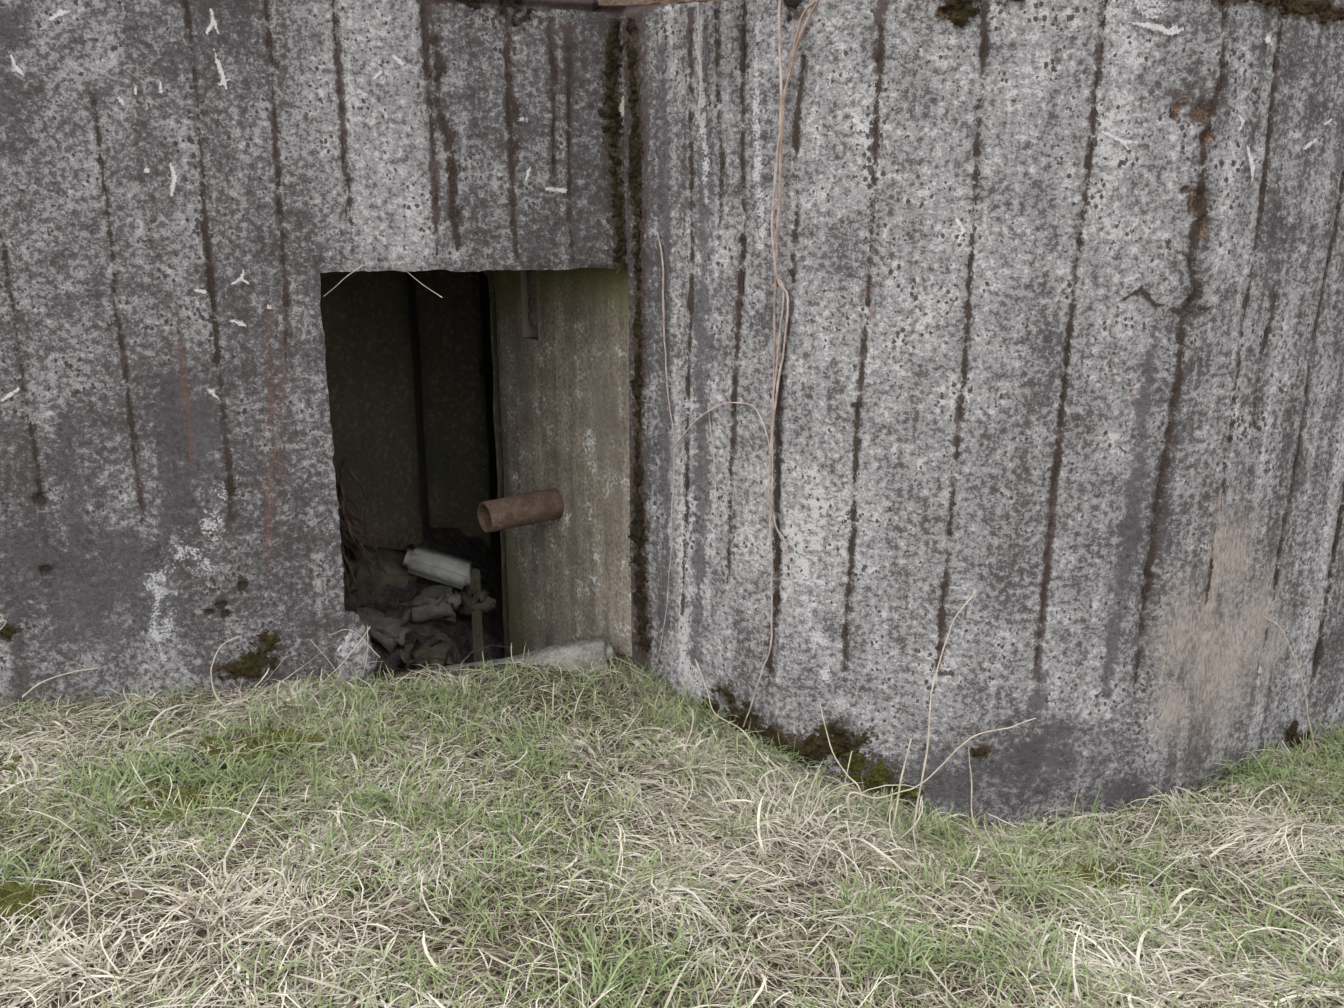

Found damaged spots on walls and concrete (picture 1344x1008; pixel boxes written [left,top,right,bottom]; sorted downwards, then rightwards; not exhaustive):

crack [1122,0,1284,691]
water stain [0,365,233,678]
water stain [873,669,1172,823]